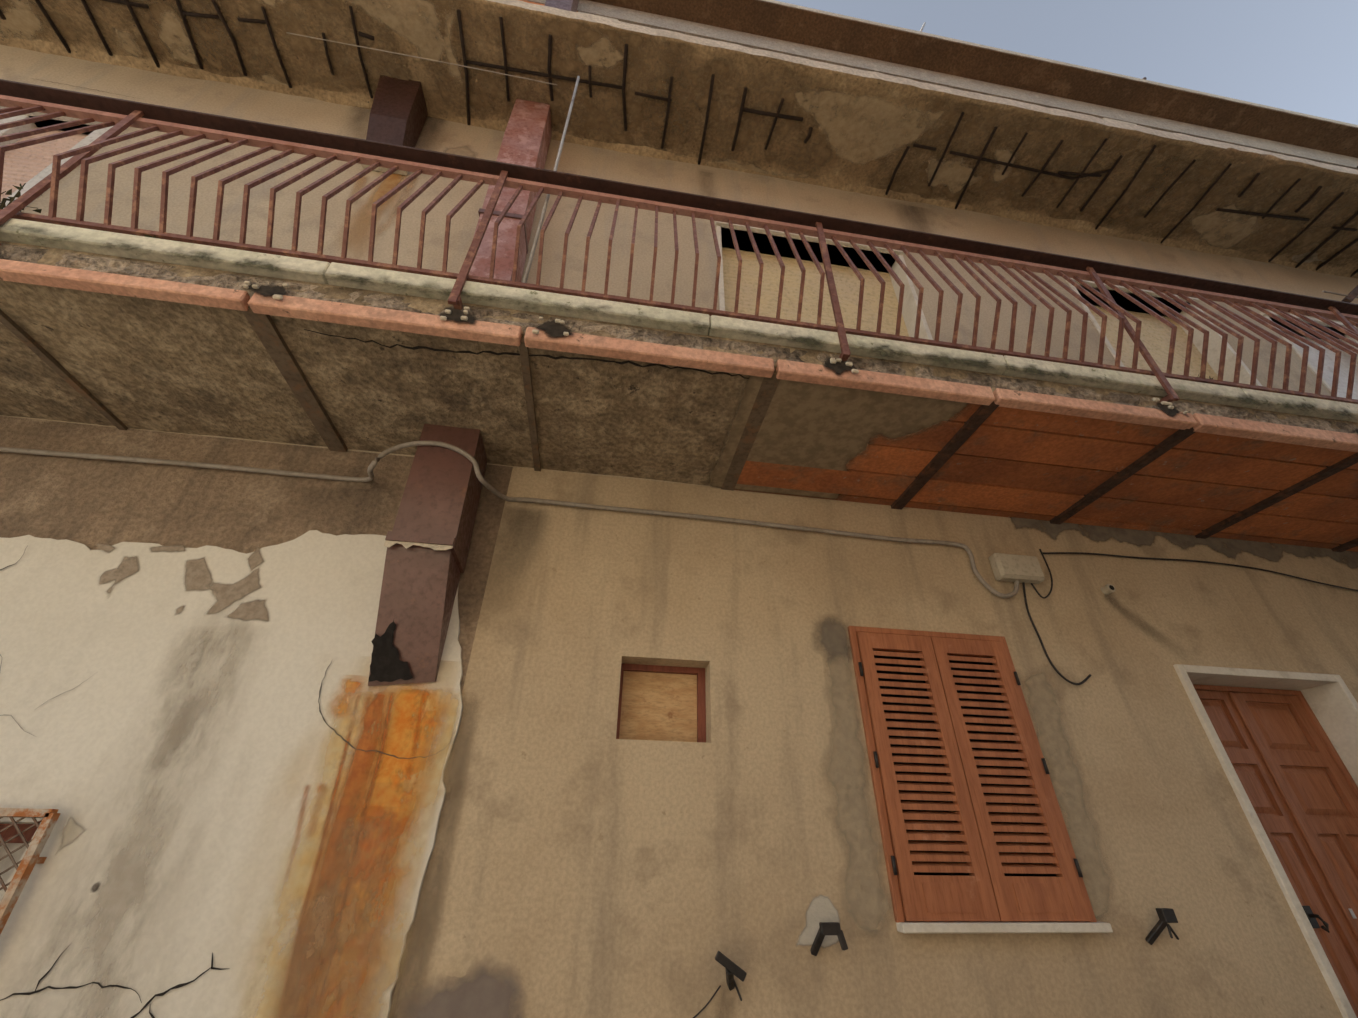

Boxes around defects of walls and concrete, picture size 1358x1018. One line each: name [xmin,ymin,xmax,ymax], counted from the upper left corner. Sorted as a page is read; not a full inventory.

spalling [0,0,1358,277]
flaking render [97,544,139,593]
flaking render [150,545,269,621]
crack [0,675,93,736]
rust [257,680,458,1018]
crack [0,946,229,1018]